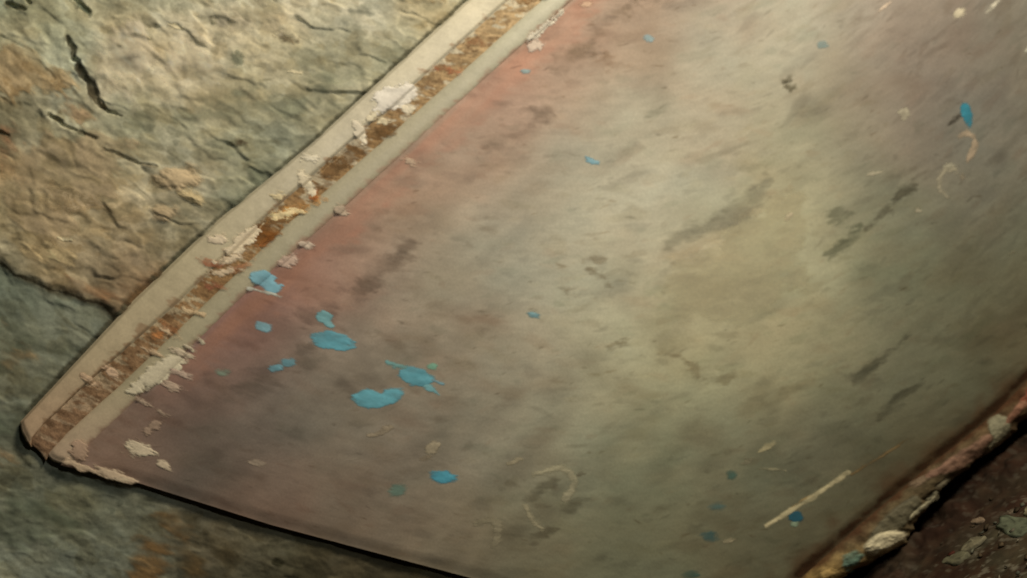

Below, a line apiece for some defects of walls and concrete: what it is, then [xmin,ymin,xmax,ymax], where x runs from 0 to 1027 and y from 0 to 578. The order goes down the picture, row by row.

crack [77,3,92,15]
peeling [527,9,564,52]
spalling [0,45,76,103]
crack [66,35,123,116]
spalling [232,51,244,65]
crack [47,113,97,139]
peeling [352,82,417,145]
peeling [297,153,320,197]
peeling [270,194,306,221]
peeling [207,225,262,277]
peeling [278,241,315,268]
peeling [0,264,466,578]